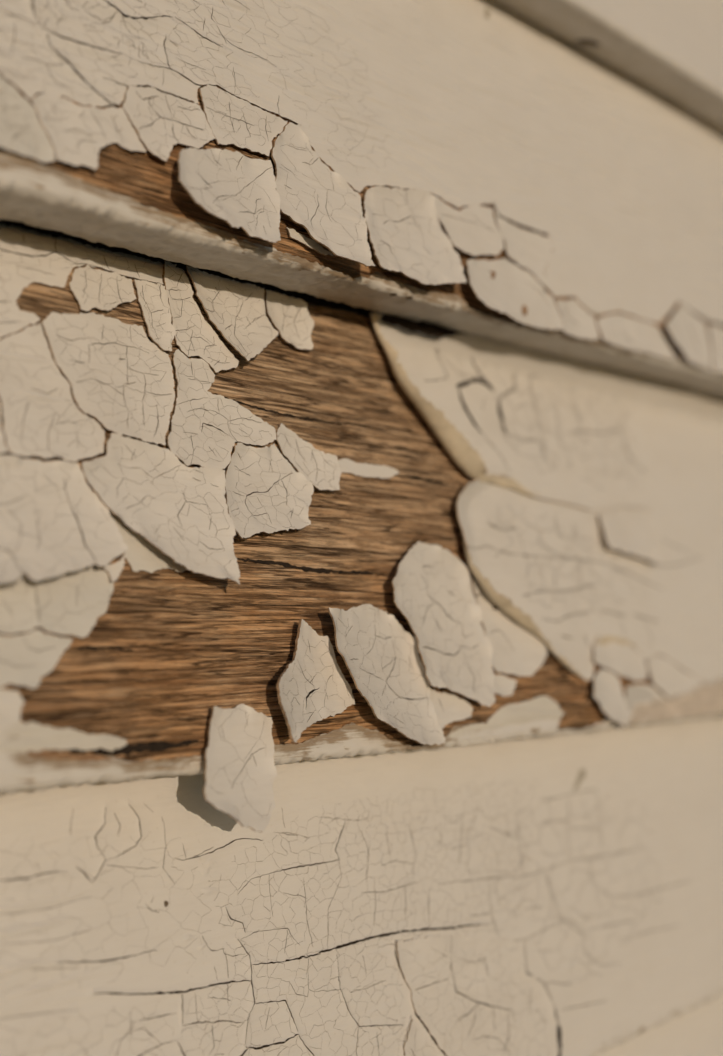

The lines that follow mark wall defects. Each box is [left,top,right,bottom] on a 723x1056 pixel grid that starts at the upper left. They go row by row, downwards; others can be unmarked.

peeling [0,75,723,374]
crack [493,203,547,235]
peeling [0,261,678,832]
crack [283,554,510,737]
crack [0,709,661,1056]